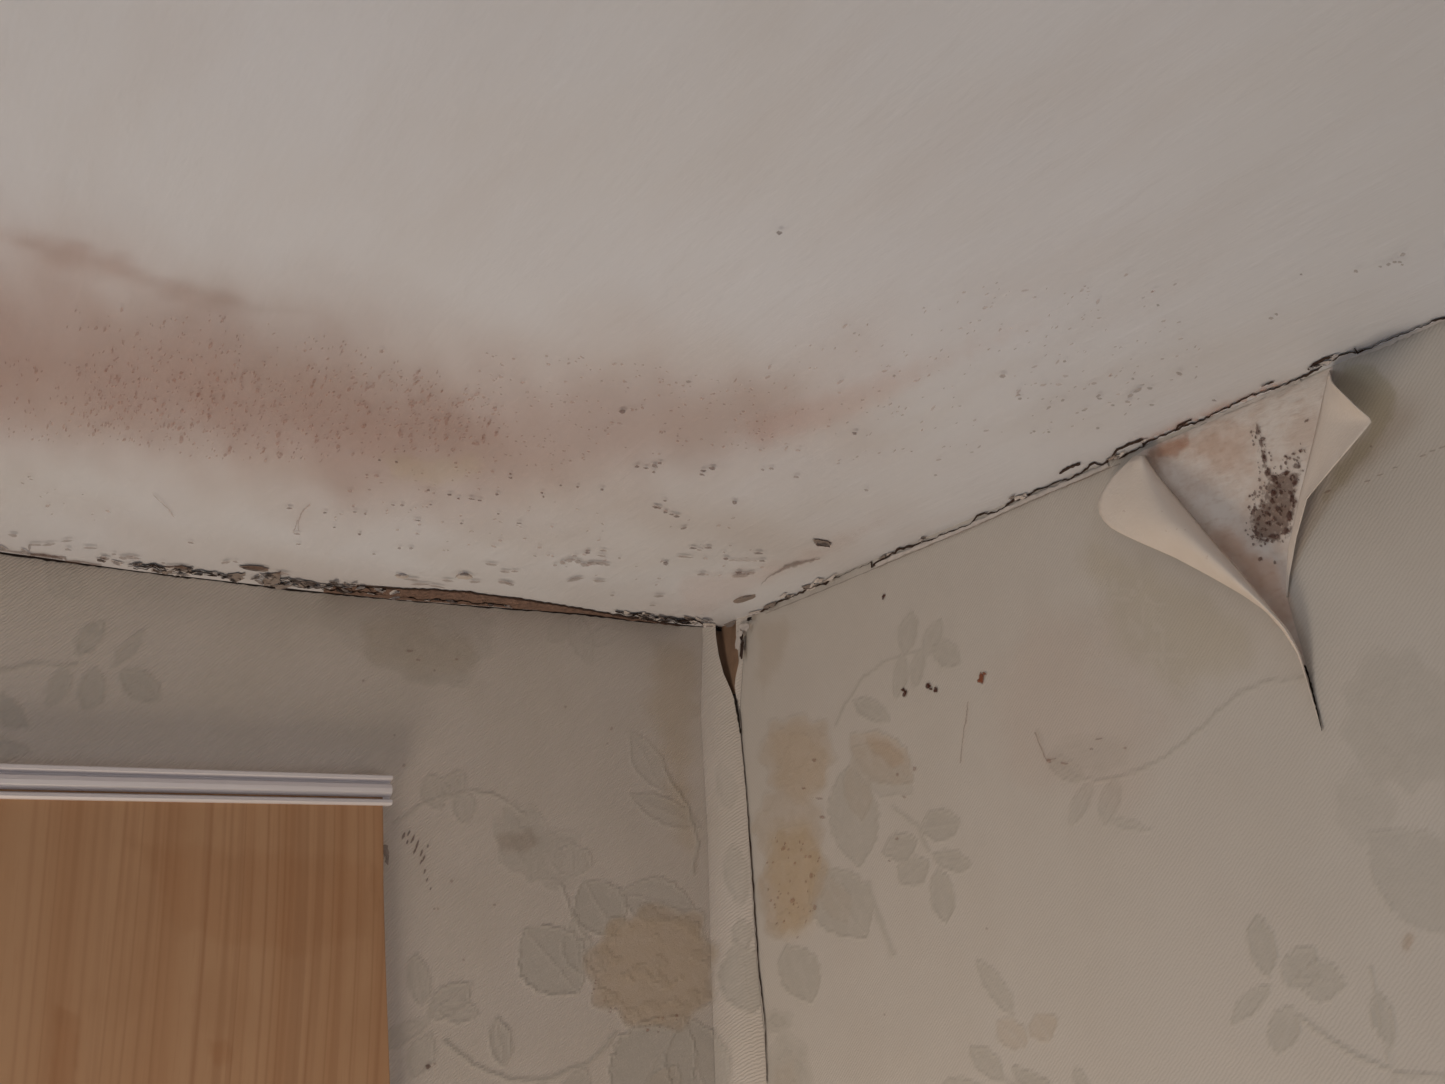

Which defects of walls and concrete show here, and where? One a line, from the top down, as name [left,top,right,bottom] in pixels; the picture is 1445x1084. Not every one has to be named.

crack [0,552,703,627]
crack [760,317,1445,612]
flaking render [875,319,1445,682]
crack [741,741,767,1080]